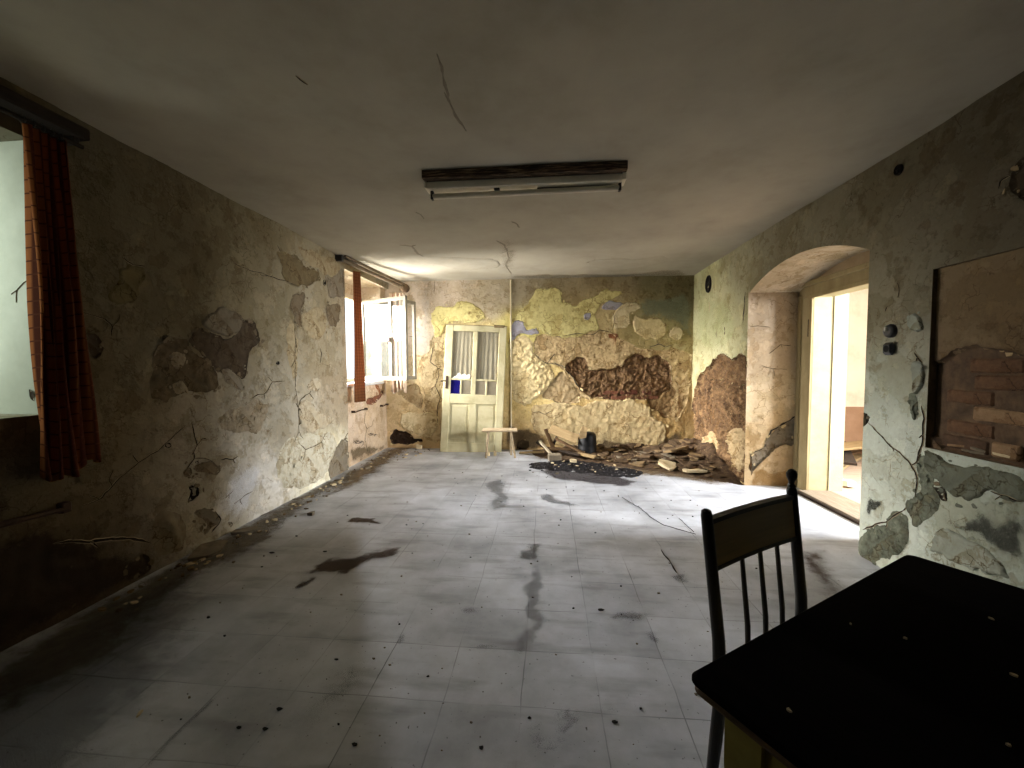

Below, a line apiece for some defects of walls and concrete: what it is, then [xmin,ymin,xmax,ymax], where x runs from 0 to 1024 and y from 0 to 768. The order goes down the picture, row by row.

crack [437,54,466,131]
crack [84,422,238,505]
spalling [149,318,265,405]
spalling [276,250,344,378]
crack [250,322,373,455]
peeling [276,301,485,489]
spalling [511,288,795,483]
crack [863,406,926,530]
spalling [858,344,1024,566]
water stain [511,543,545,654]
peeling [930,528,1010,579]